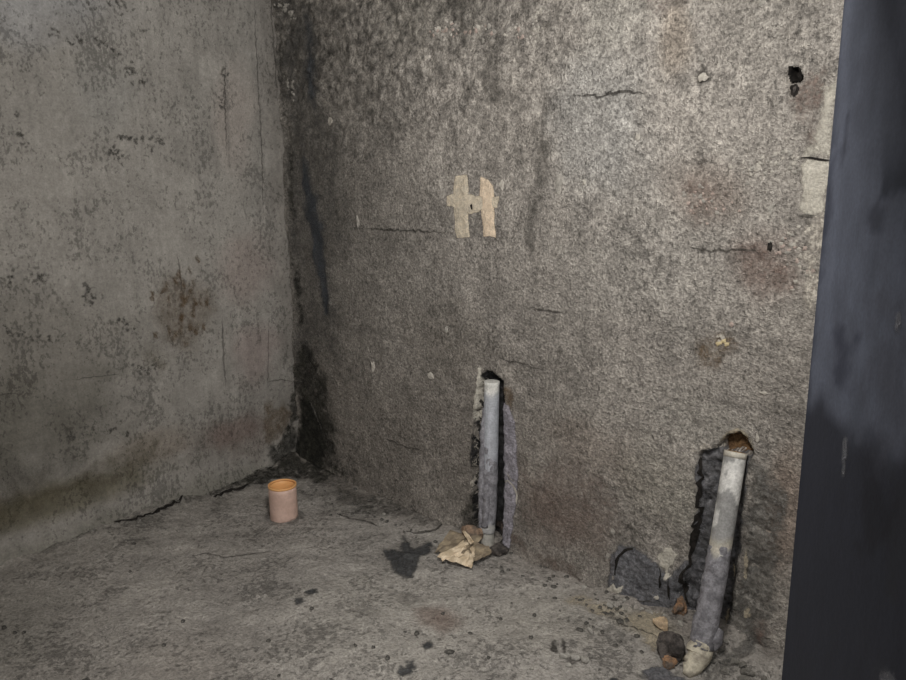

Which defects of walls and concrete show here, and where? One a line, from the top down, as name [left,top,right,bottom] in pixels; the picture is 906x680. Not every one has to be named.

crack [575,90,644,98]
spalling [788,66,820,97]
water stain [302,163,328,314]
crack [362,226,440,234]
crack [691,247,761,255]
water stain [234,346,343,484]
spalling [473,367,485,421]
crack [114,467,272,522]